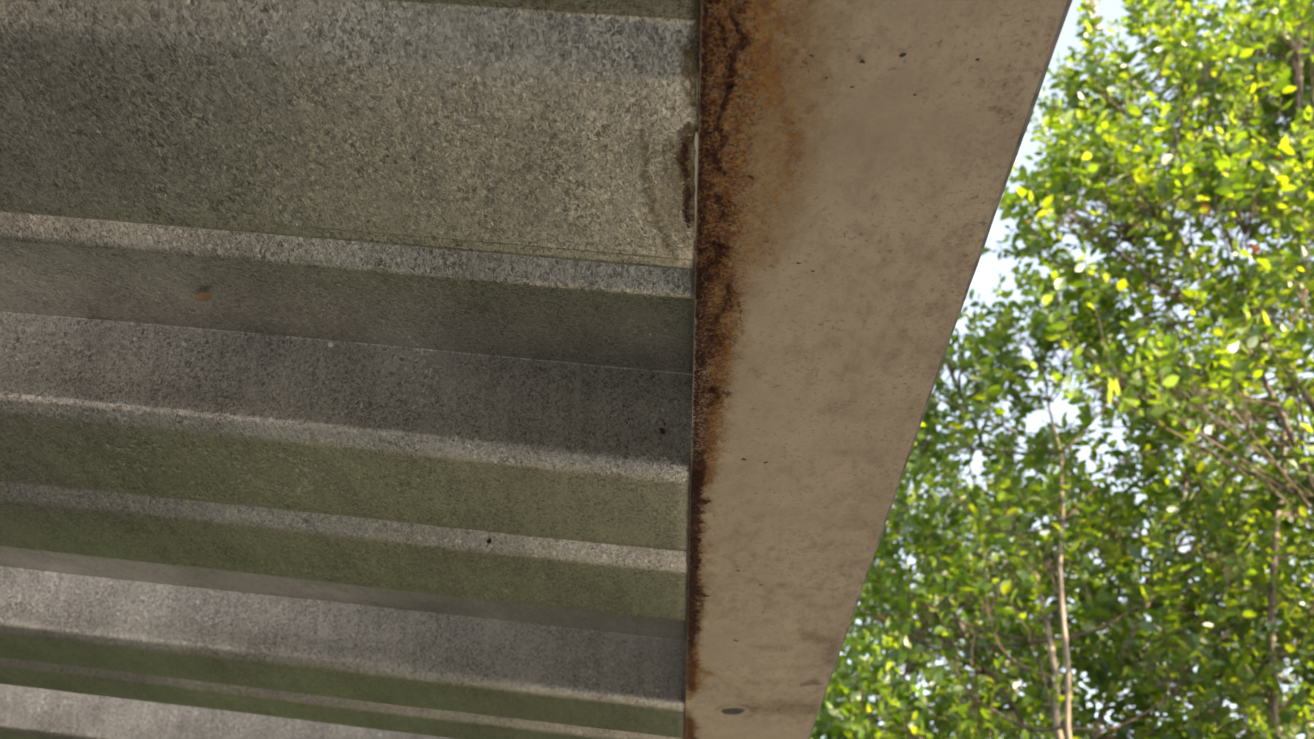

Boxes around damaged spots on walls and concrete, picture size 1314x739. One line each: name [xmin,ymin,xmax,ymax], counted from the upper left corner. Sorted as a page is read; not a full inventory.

corrosion [685,0,817,739]